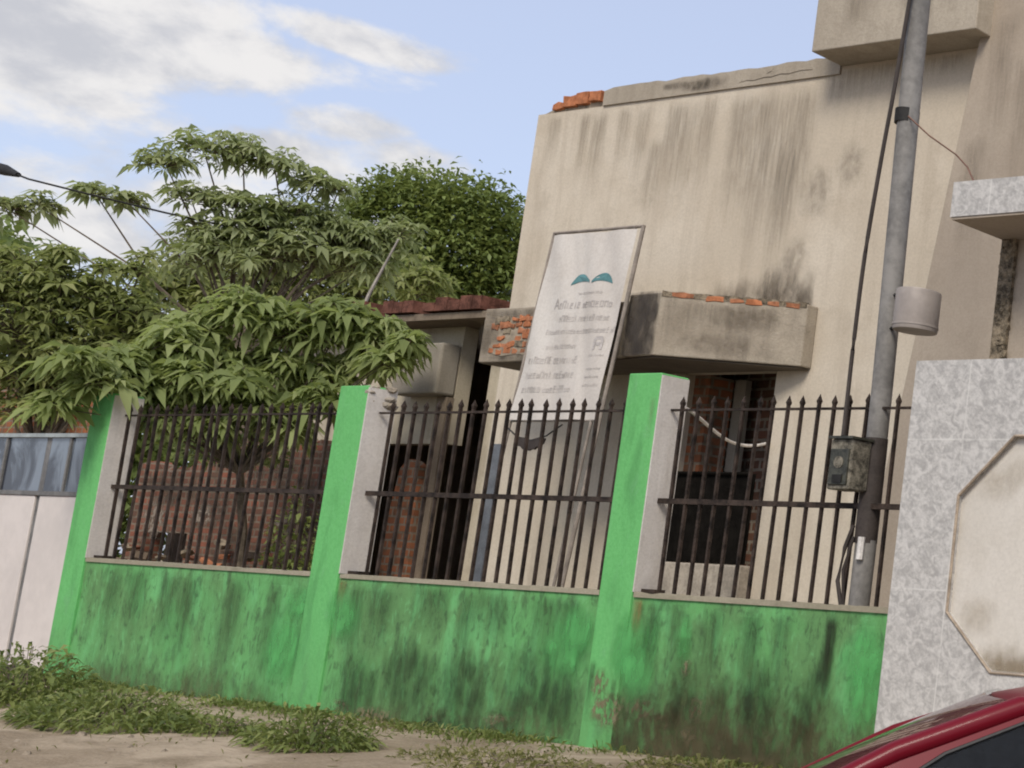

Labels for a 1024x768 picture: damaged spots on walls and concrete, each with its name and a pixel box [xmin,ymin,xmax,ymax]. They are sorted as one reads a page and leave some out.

flaking render [552,90,604,111]
flaking render [662,290,811,309]
spalling [488,314,533,356]
leakage [849,633,880,723]